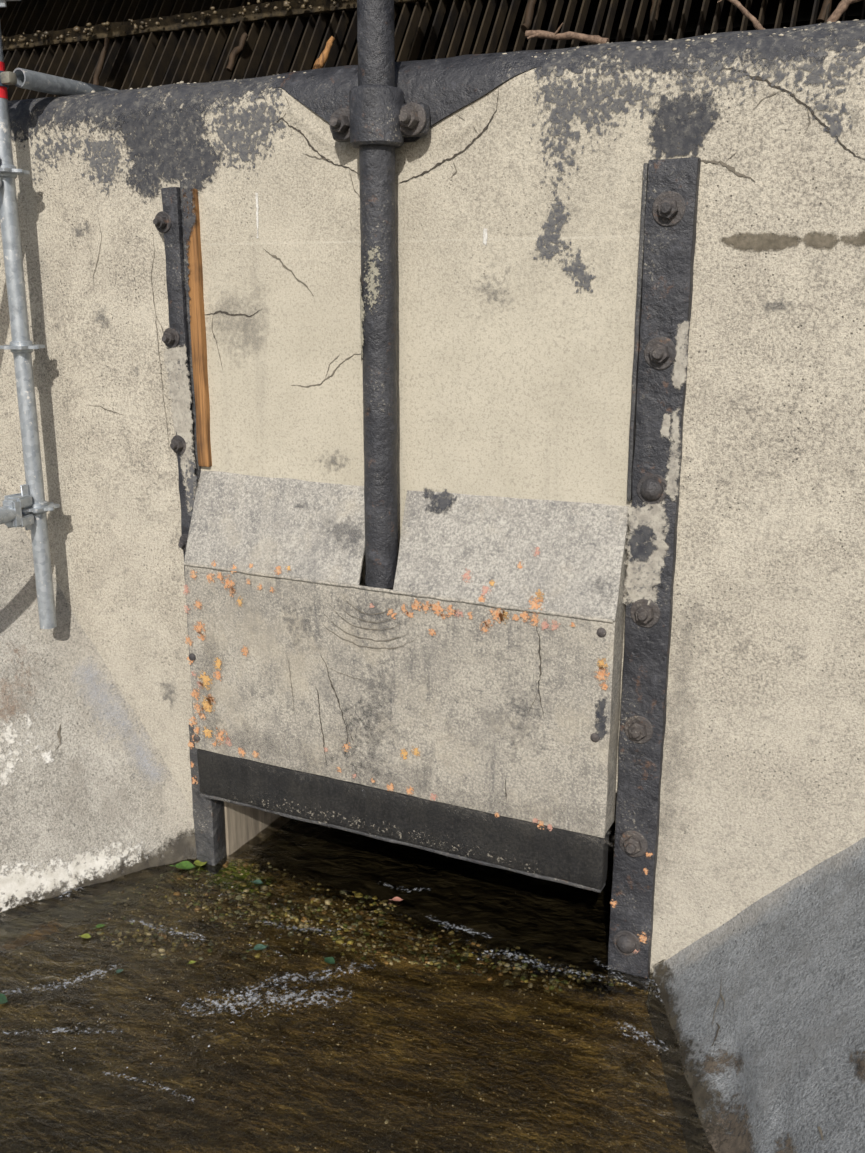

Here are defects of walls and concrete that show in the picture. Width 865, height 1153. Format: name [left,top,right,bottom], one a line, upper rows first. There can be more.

crack [399,88,499,183]
crack [722,67,864,159]
leakage [721,231,865,252]
crack [264,249,314,296]
leakage [560,242,596,293]
crack [294,354,354,387]
peeling [628,525,657,562]
crack [287,653,363,766]
leakage [0,830,197,924]
leakage [645,960,729,1153]
leakage [850,1051,865,1081]